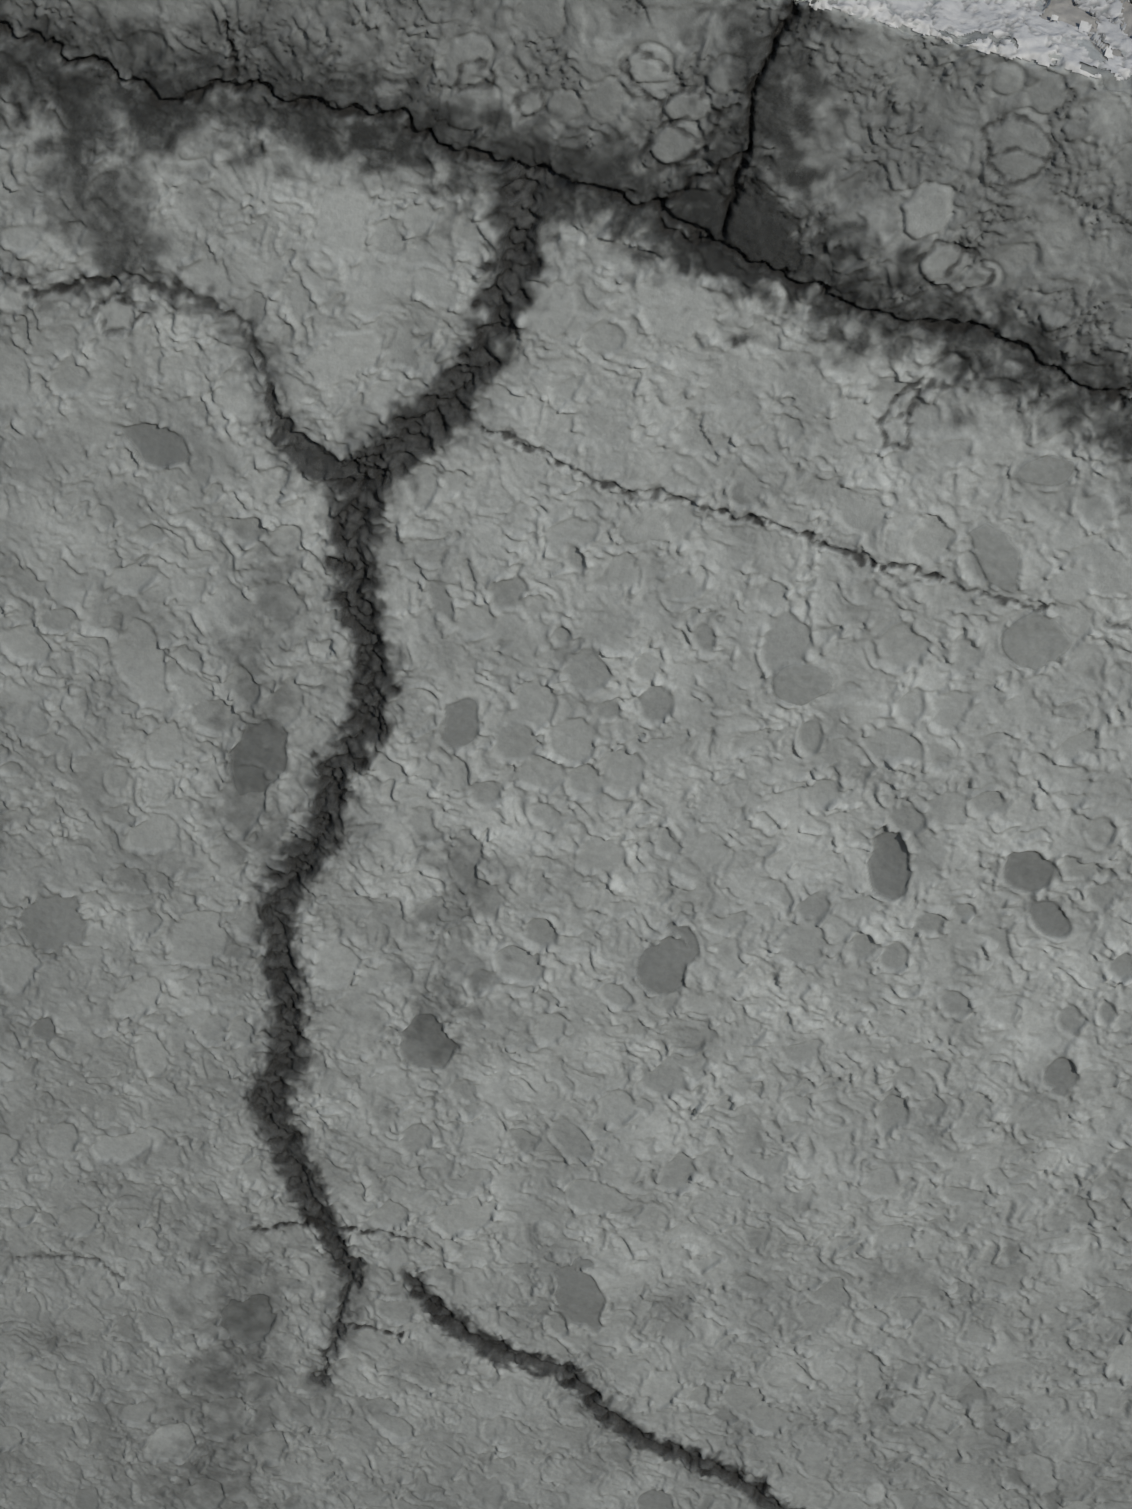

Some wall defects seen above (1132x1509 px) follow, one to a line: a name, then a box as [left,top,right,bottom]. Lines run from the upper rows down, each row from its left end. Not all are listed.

crack [920,317,1132,408]
crack [0,0,953,1385]
crack [984,591,1048,607]
crack [403,1272,785,1509]